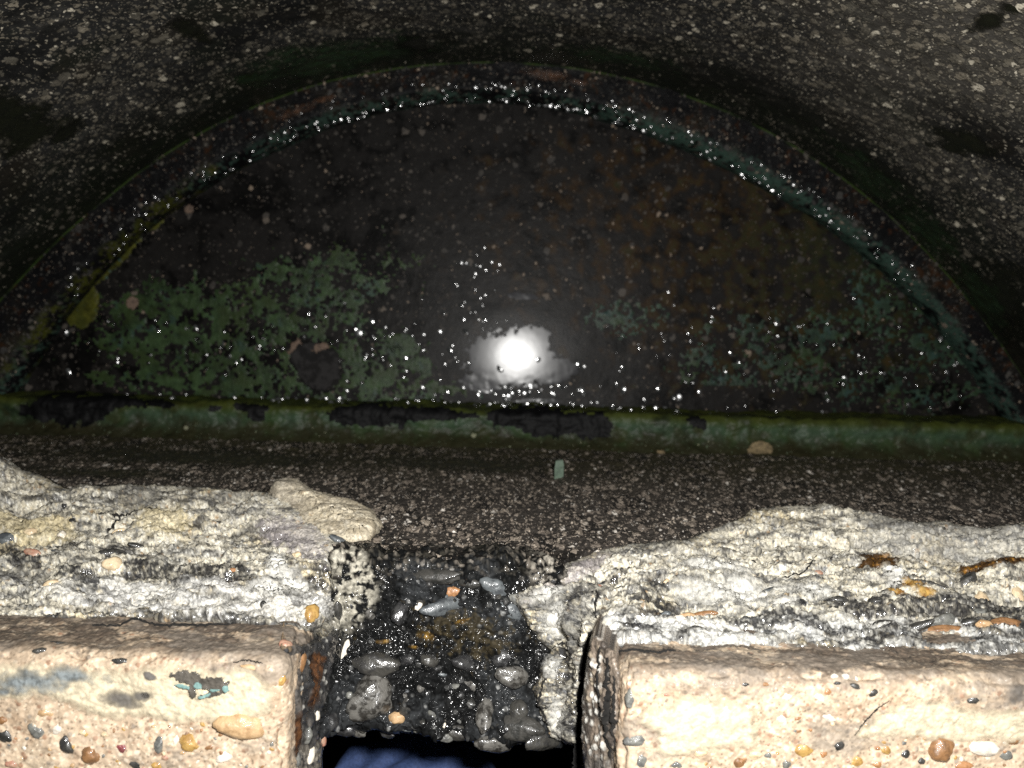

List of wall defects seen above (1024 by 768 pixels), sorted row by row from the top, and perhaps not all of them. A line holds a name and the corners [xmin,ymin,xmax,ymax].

spalling [319,539,584,768]